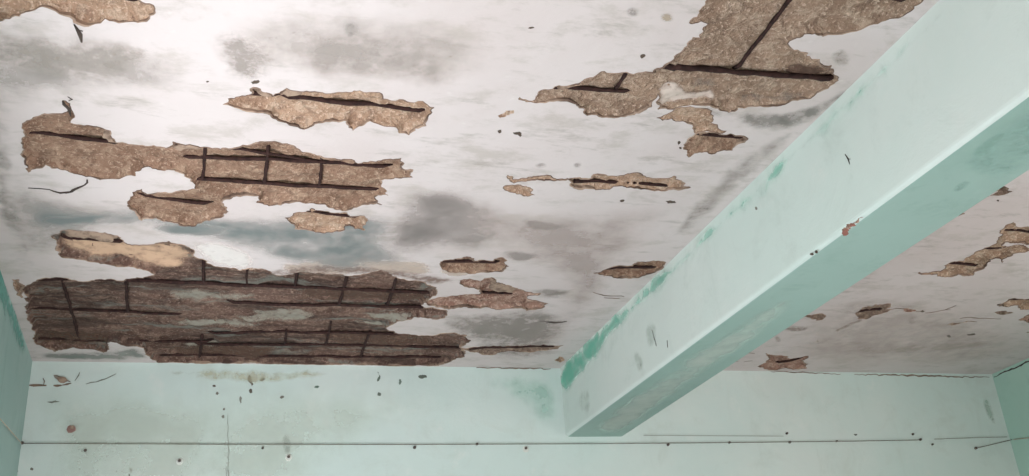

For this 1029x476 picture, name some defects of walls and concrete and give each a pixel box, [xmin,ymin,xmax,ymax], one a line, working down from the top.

spalling [0,0,156,27]
leakage [5,44,148,84]
leakage [227,40,263,75]
spalling [498,0,924,158]
spalling [20,100,413,233]
spalling [503,172,691,203]
leakage [0,192,485,267]
spalling [918,222,1029,277]
leakage [0,271,23,346]
leakage [47,349,143,359]
spalling [12,229,565,404]
leakage [454,315,555,354]